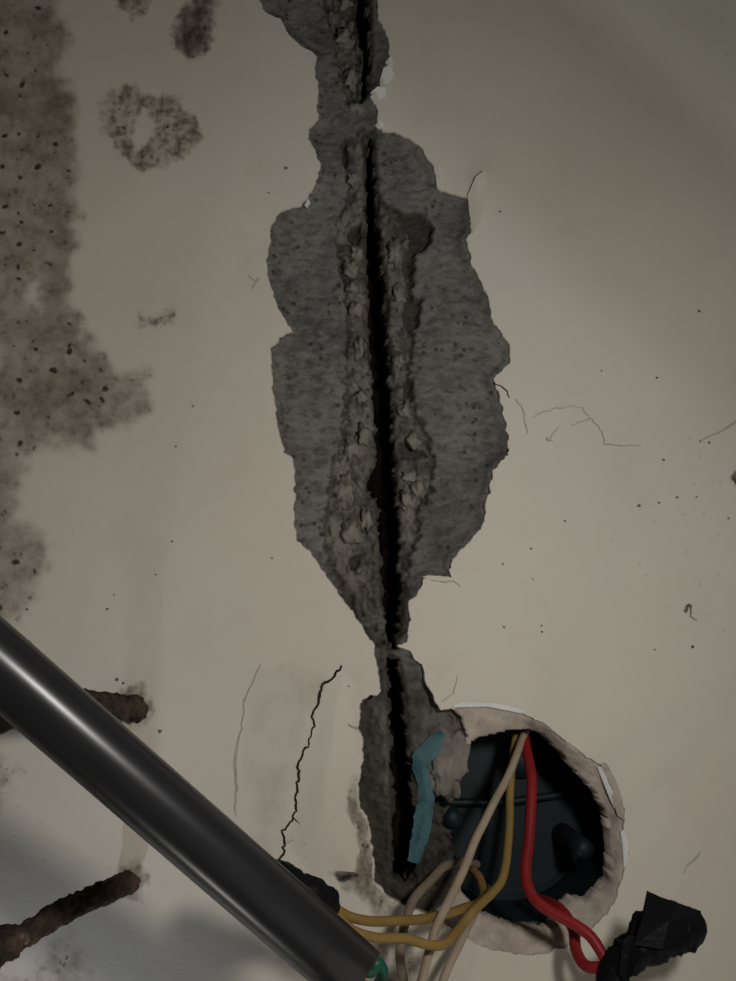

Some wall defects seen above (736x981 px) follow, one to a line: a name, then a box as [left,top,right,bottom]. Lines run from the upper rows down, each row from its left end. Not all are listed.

leakage [0,70,72,172]
leakage [112,87,199,167]
leakage [176,0,212,57]
crack [355,0,367,101]
leakage [0,315,127,456]
crack [365,155,417,881]
spalling [260,0,628,954]
crack [279,665,342,860]